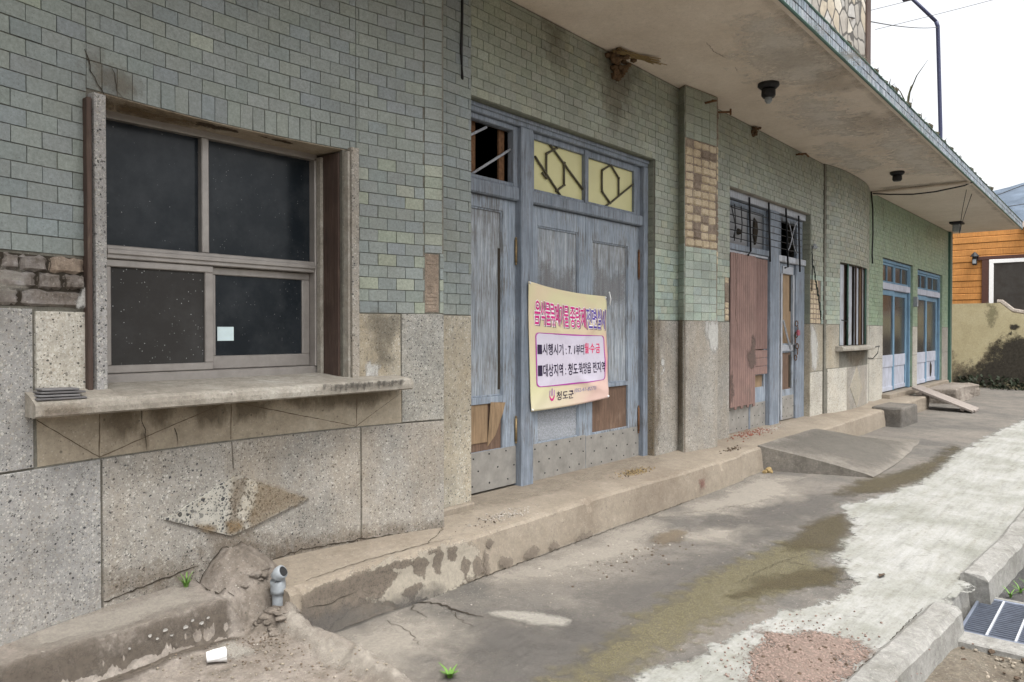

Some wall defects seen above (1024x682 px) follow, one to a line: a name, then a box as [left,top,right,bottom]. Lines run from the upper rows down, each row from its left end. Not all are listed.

crack [84,49,118,95]